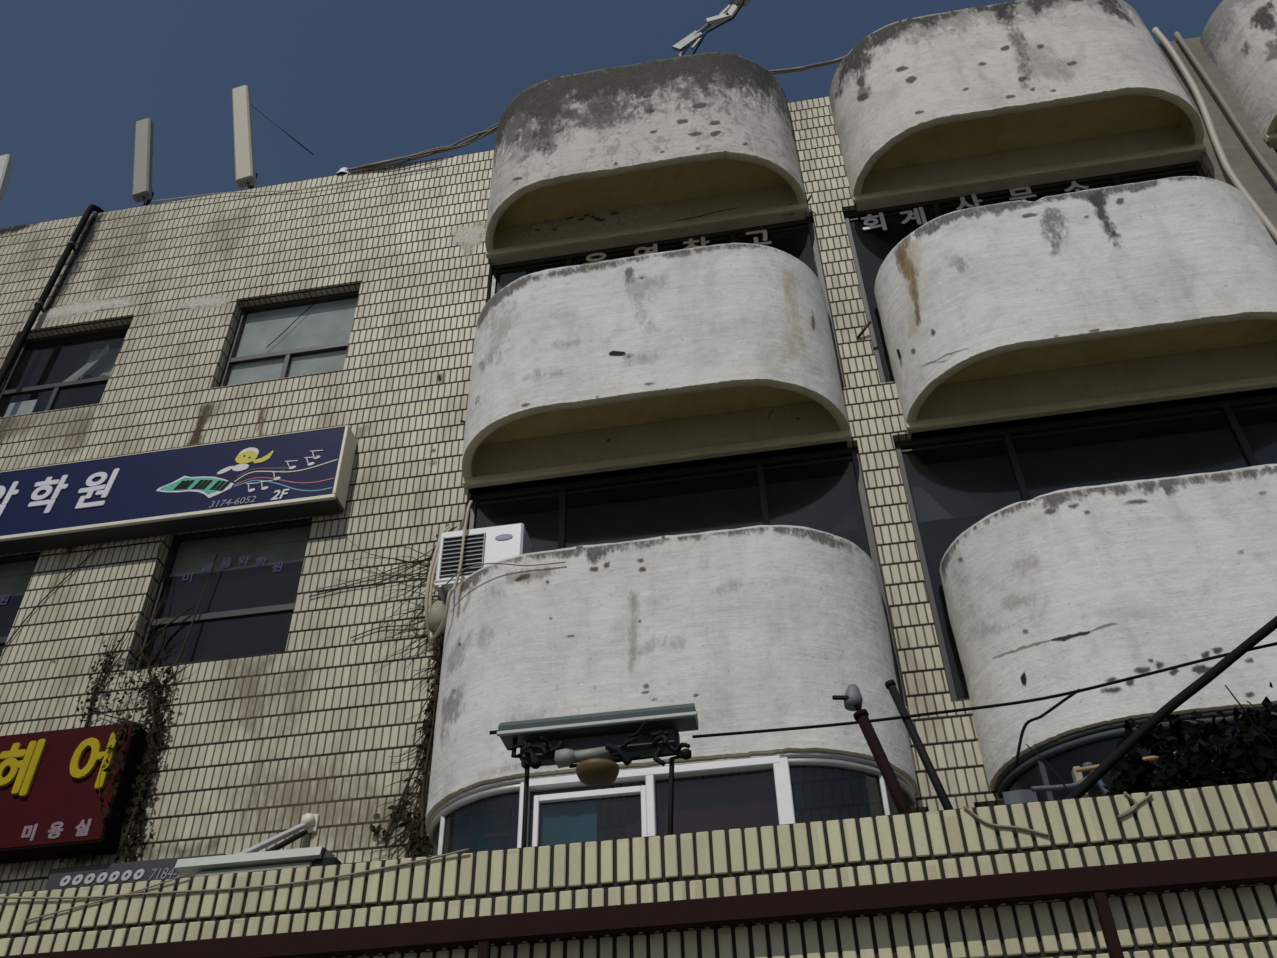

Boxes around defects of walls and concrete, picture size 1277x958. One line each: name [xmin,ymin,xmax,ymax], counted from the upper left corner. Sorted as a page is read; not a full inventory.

damp [835,11,956,98]
damp [974,0,1058,78]
damp [1099,0,1132,23]
mould [1251,2,1277,60]
mould [496,52,776,157]
damp [914,176,1207,253]
rust [895,238,920,324]
crack [992,623,1116,659]
spalling [1101,647,1222,692]